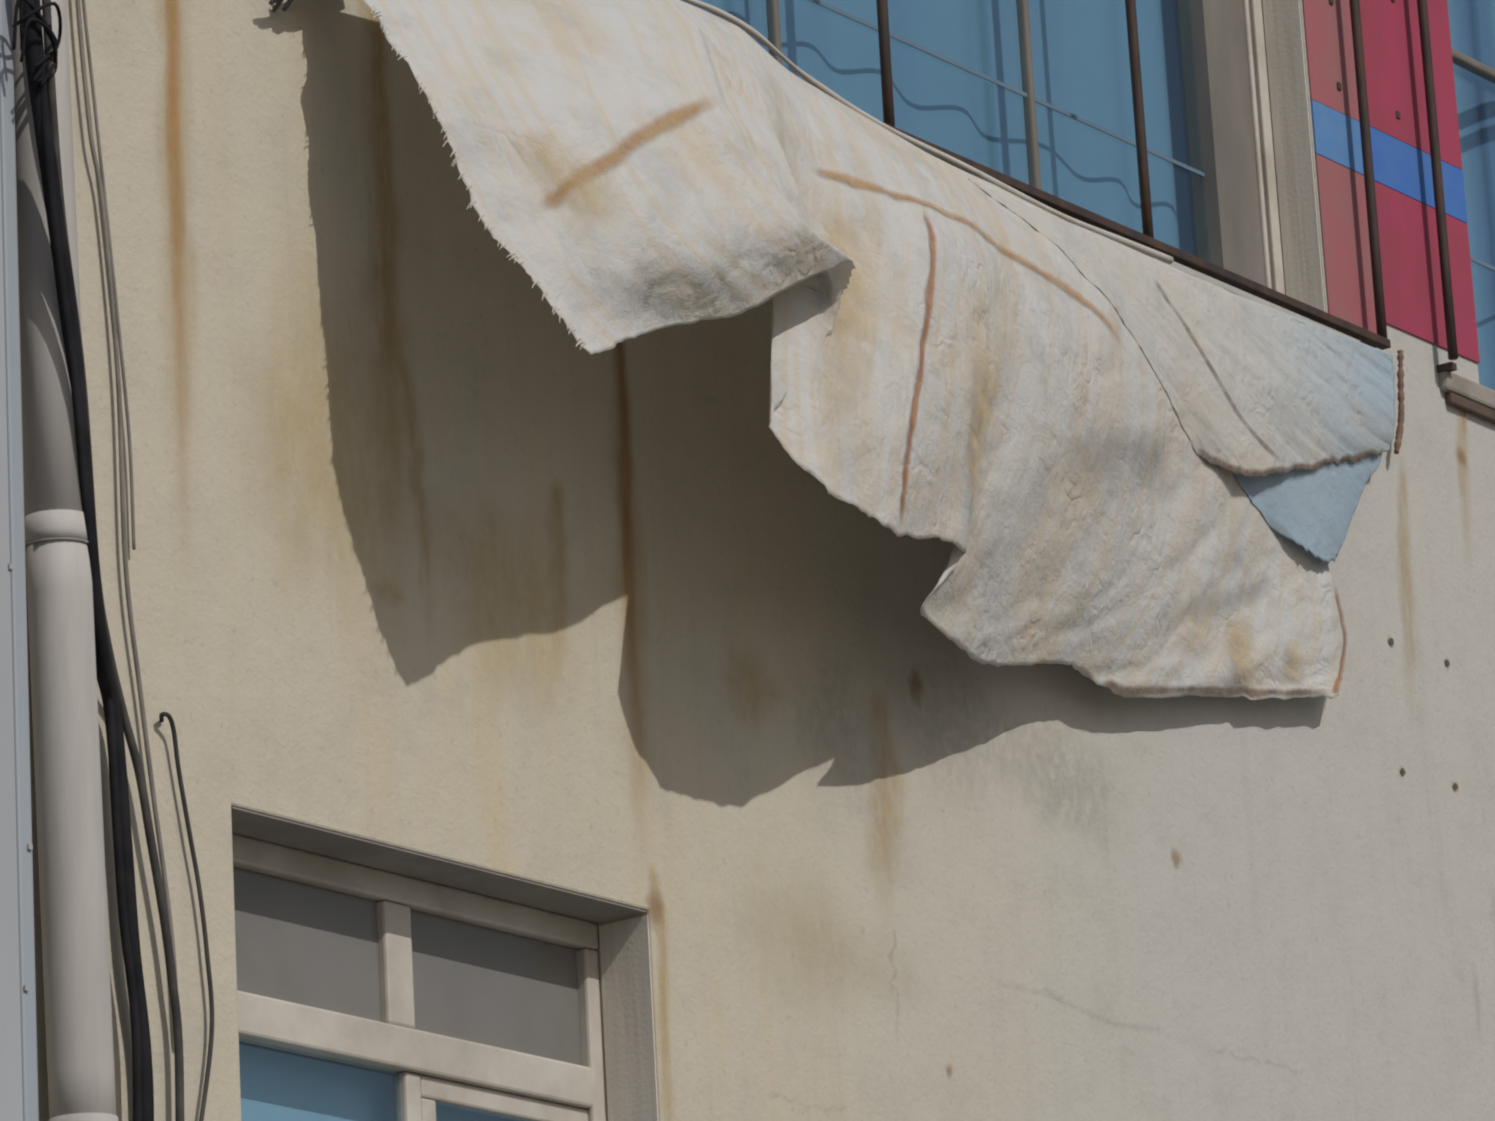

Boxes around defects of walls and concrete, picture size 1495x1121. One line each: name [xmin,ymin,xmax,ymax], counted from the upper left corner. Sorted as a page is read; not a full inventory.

rust [1394,350,1405,454]